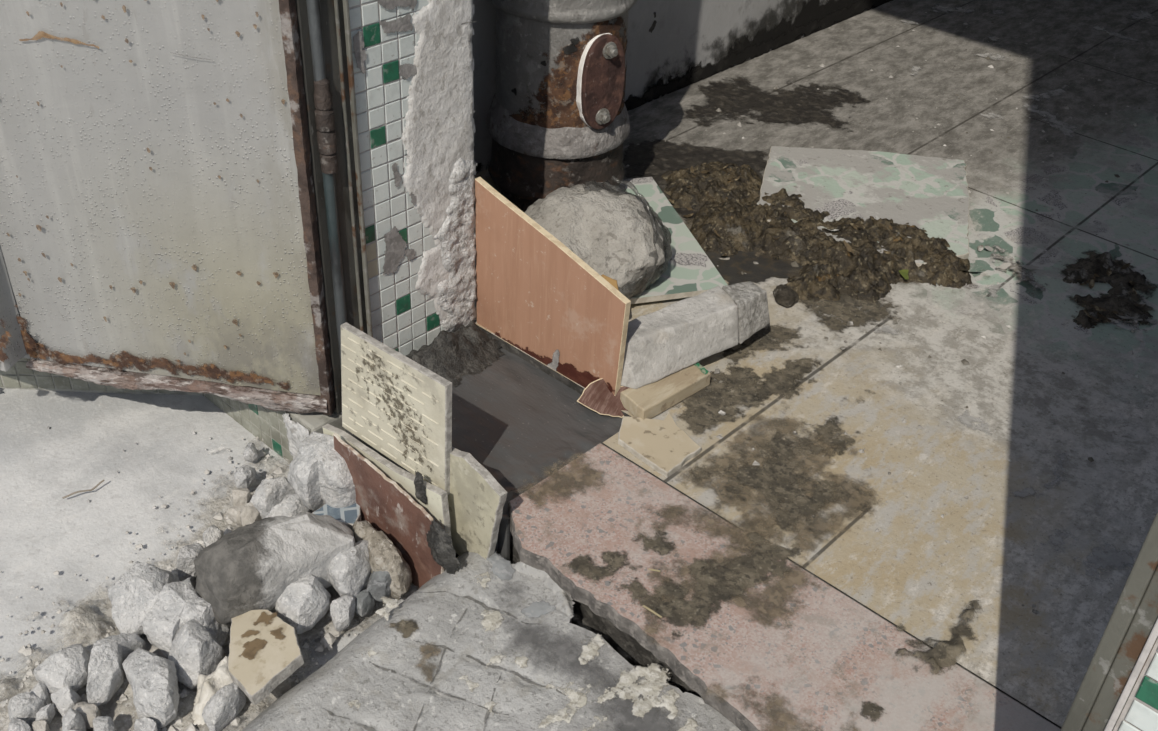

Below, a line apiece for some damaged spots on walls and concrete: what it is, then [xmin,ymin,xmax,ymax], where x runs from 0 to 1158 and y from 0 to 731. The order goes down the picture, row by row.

rust [19,31,99,49]
rust [509,17,628,129]
damp [624,0,893,129]
flaking render [432,158,477,332]
rust [0,293,290,390]